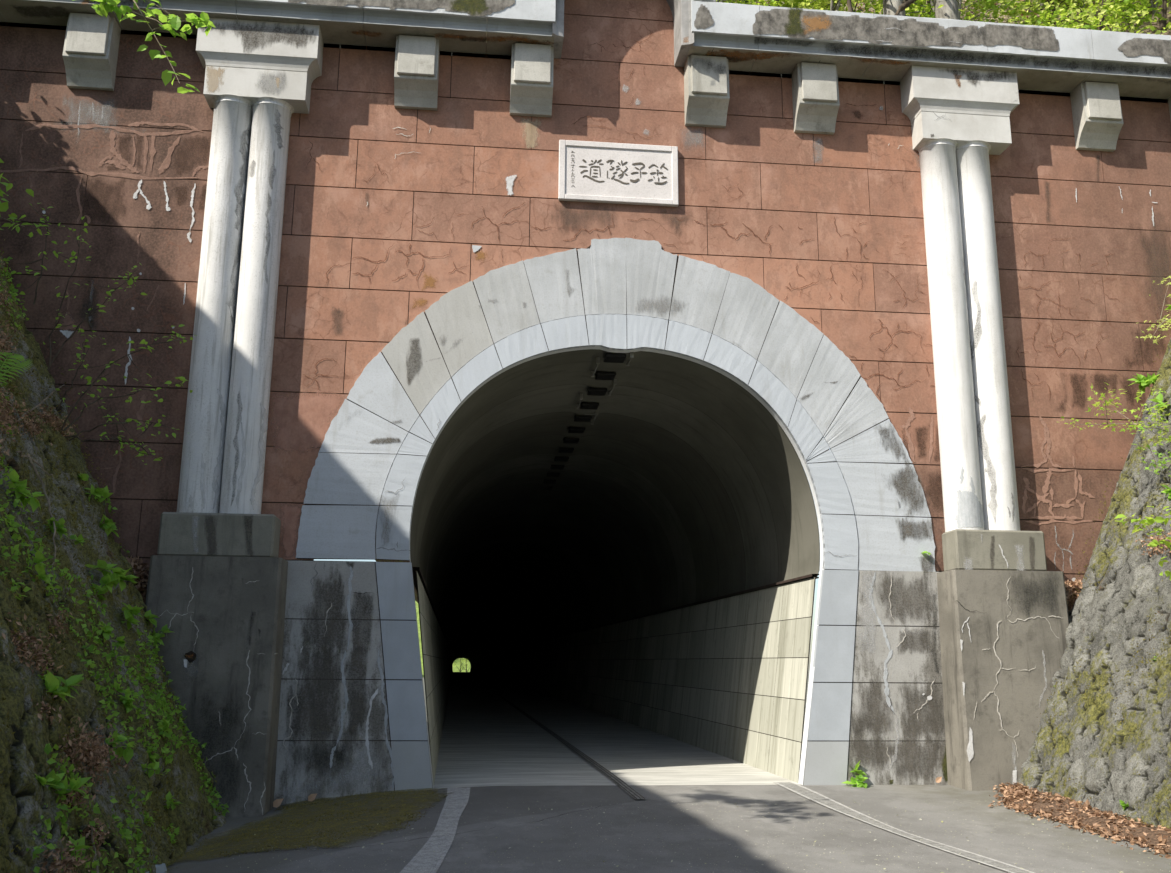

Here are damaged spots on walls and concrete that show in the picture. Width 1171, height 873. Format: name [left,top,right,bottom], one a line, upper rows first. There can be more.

peeling [288,0,515,16]
peeling [753,7,1059,51]
peeling [1118,38,1171,64]
crack [0,121,209,224]
damp [164,181,207,242]
damp [406,340,421,383]
crack [326,183,934,462]
crack [1016,237,1117,526]
damp [880,428,943,540]
damp [282,566,378,785]
damp [851,557,944,777]
crack [959,545,1061,754]